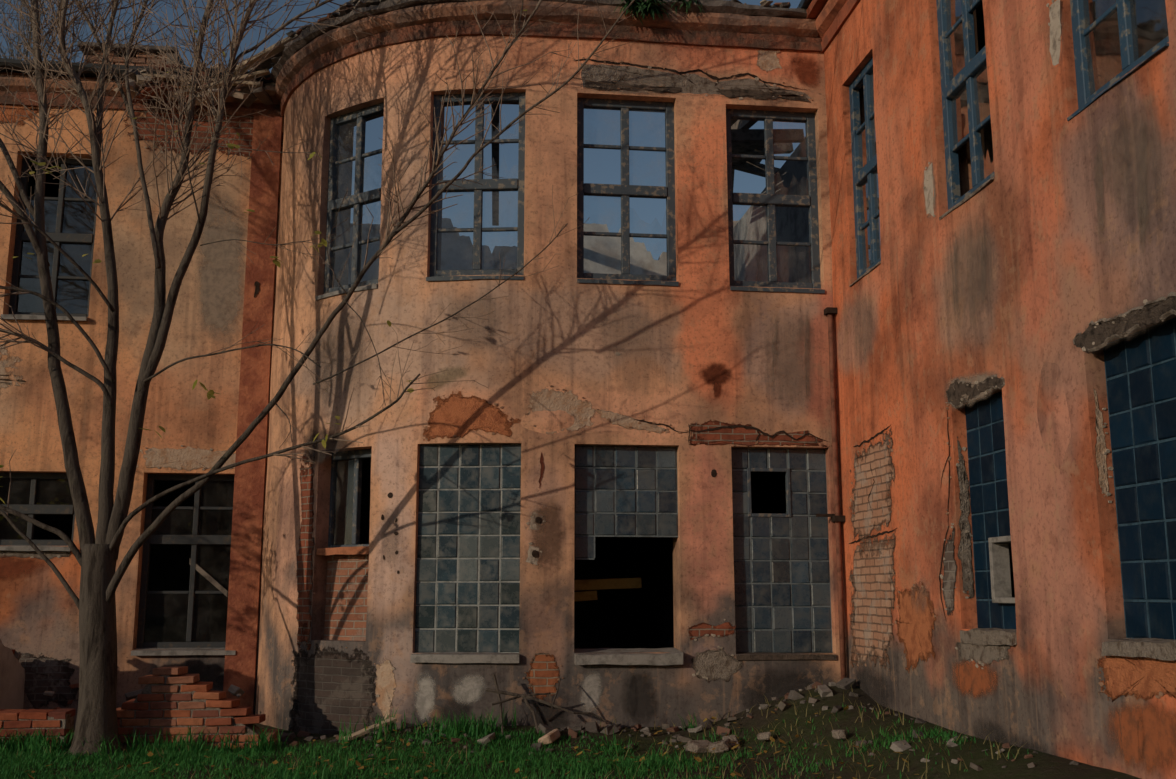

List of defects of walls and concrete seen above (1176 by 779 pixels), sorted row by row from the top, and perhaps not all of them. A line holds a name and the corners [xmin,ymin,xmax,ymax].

flaking render [580,50,813,101]
flaking render [423,385,669,441]
flaking render [689,419,832,447]
flaking render [849,428,974,673]
flaking render [290,454,397,734]
flaking render [523,653,564,700]
flaking render [955,642,1010,669]
flaking render [1097,656,1176,703]